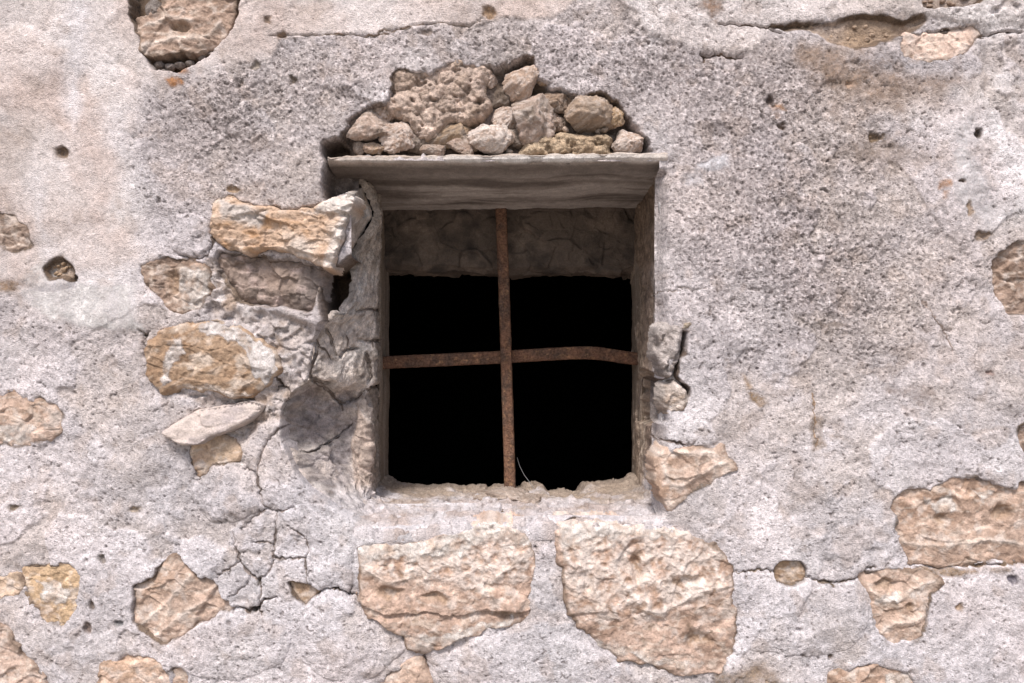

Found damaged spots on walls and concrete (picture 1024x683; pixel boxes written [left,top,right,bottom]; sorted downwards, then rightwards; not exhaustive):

spalling [128,0,240,72]
spalling [840,0,983,62]
spalling [344,57,644,164]
spalling [141,186,372,477]
spalling [991,241,1024,315]
crack [219,329,384,615]
spalling [644,440,738,511]
spalling [0,562,80,626]
spalling [114,553,236,645]
spalling [356,509,536,683]
spalling [552,510,737,676]
spalling [857,475,1024,643]